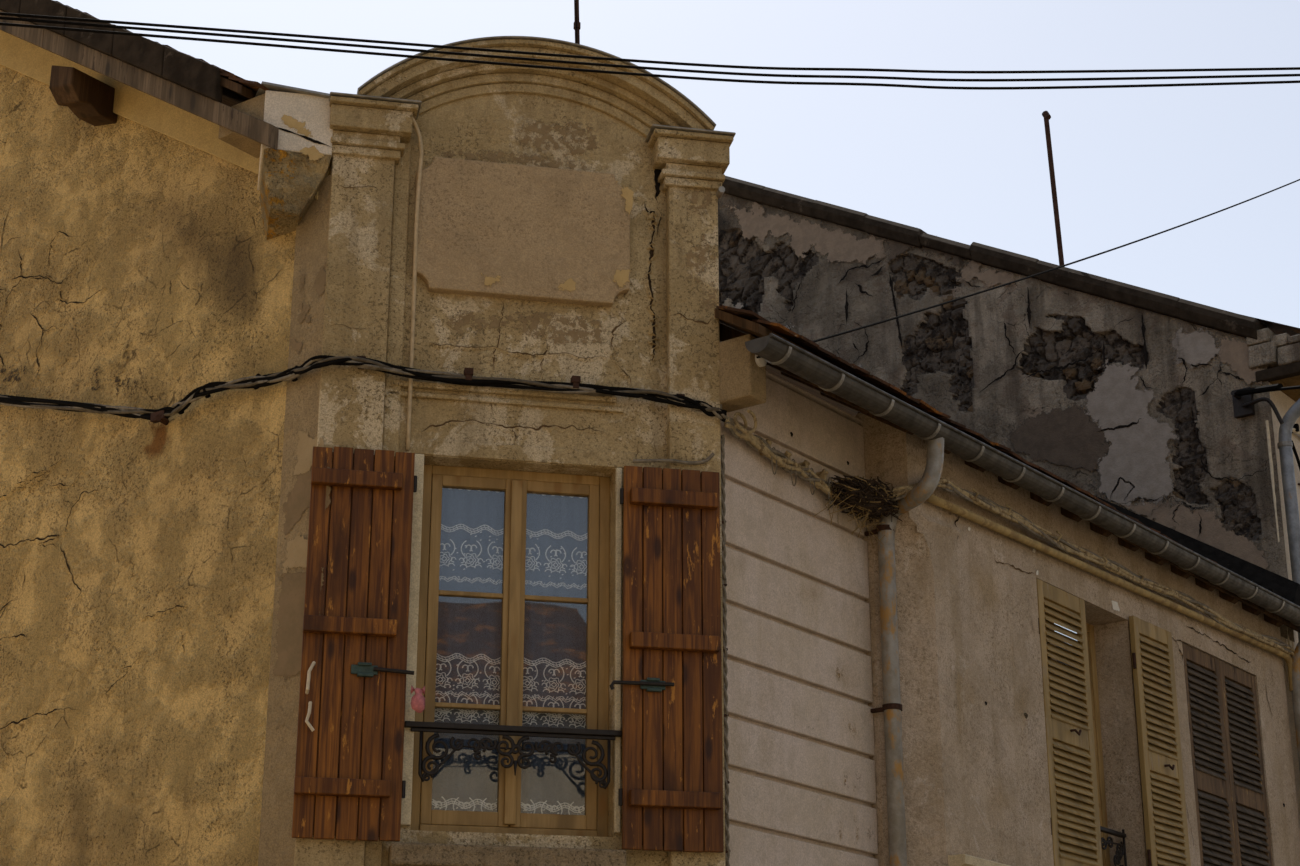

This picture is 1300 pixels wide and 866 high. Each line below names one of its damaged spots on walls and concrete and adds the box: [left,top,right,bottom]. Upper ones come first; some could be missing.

crack [0,207,106,384]
crack [421,169,715,445]
spalling [685,228,819,314]
crack [839,259,902,359]
spalling [888,254,974,412]
spalling [1008,315,1149,472]
spalling [1156,387,1262,541]
crack [0,456,99,643]
crack [0,605,188,733]